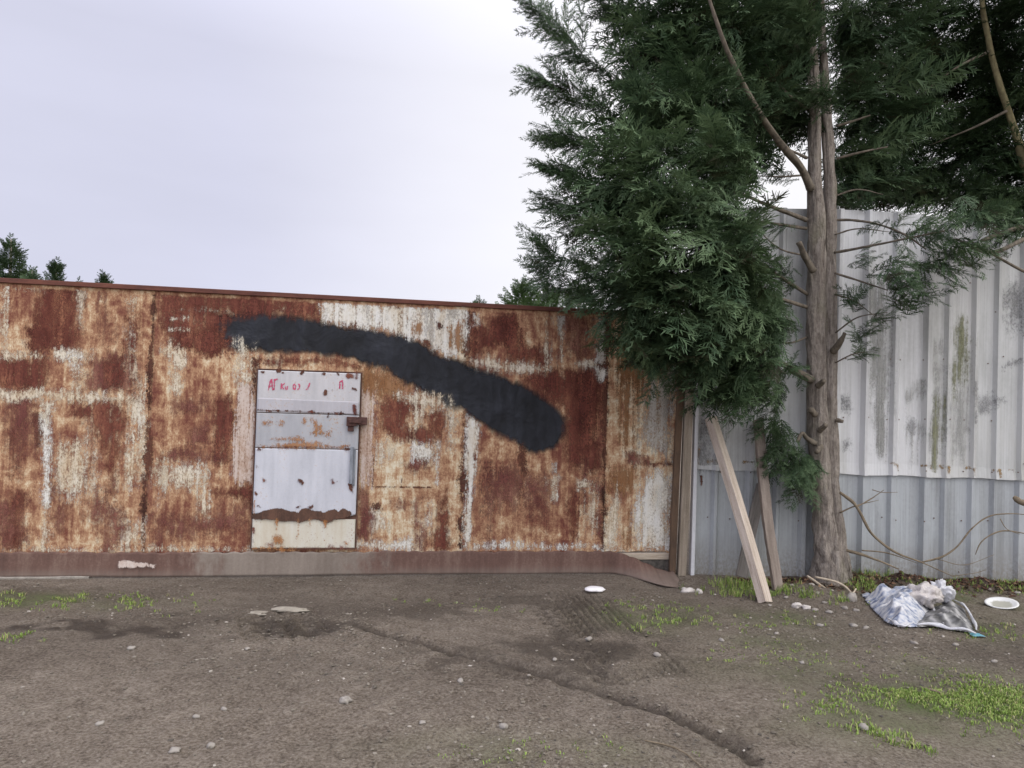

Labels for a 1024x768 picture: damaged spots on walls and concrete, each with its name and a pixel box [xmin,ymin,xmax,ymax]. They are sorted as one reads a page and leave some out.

corrosion [0,289,550,552]
corrosion [436,311,671,550]
damp [906,317,1004,472]